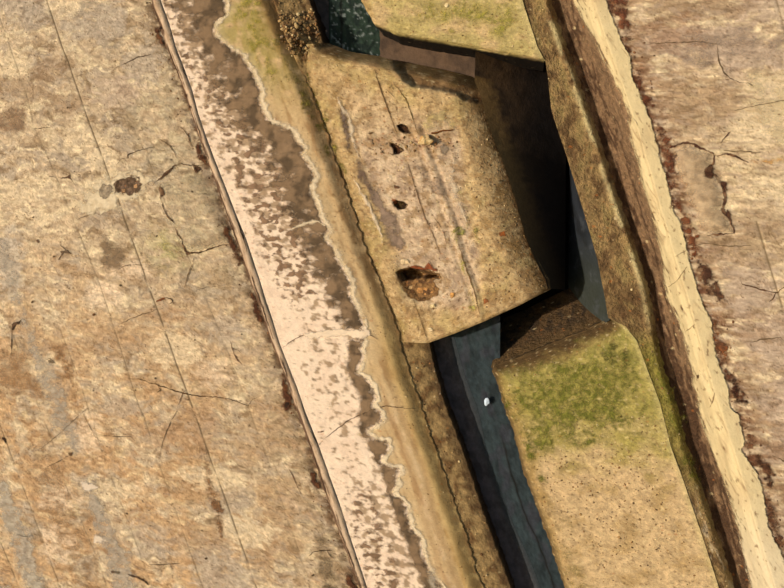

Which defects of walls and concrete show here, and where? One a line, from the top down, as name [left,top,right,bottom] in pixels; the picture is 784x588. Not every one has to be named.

rust [609,0,630,29]
rust [634,70,655,107]
spalling [99,175,142,199]
rust [656,127,678,189]
rust [676,202,724,301]
water stain [164,0,446,588]
spalling [397,259,441,308]
crack [140,379,255,453]